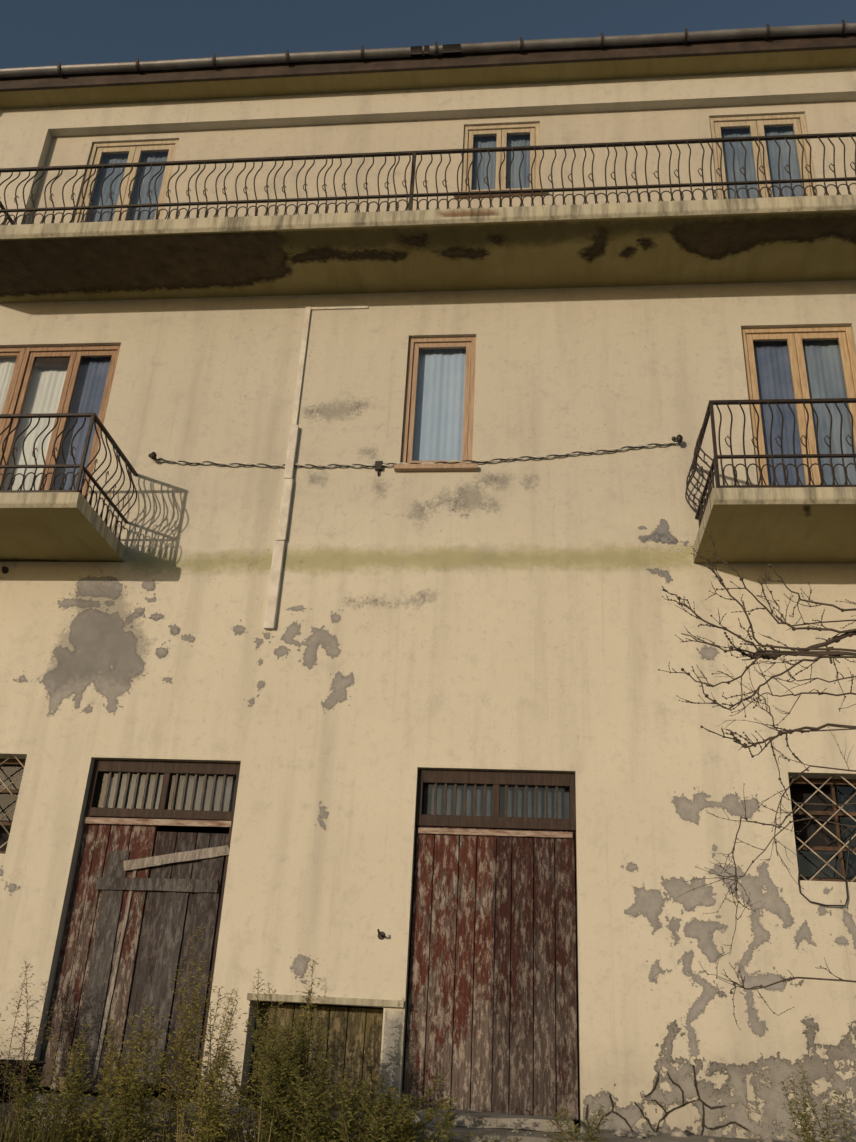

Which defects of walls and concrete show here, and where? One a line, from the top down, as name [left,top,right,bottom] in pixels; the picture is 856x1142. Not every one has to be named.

water stain [263,214,856,250]
peeling [637,519,689,546]
peeling [646,568,673,583]
peeling [13,570,195,717]
peeling [226,604,355,714]
peeling [315,801,329,830]
peeling [671,787,766,825]
peeling [289,950,311,983]
flaking render [583,845,856,1142]
crack [585,1065,749,1135]